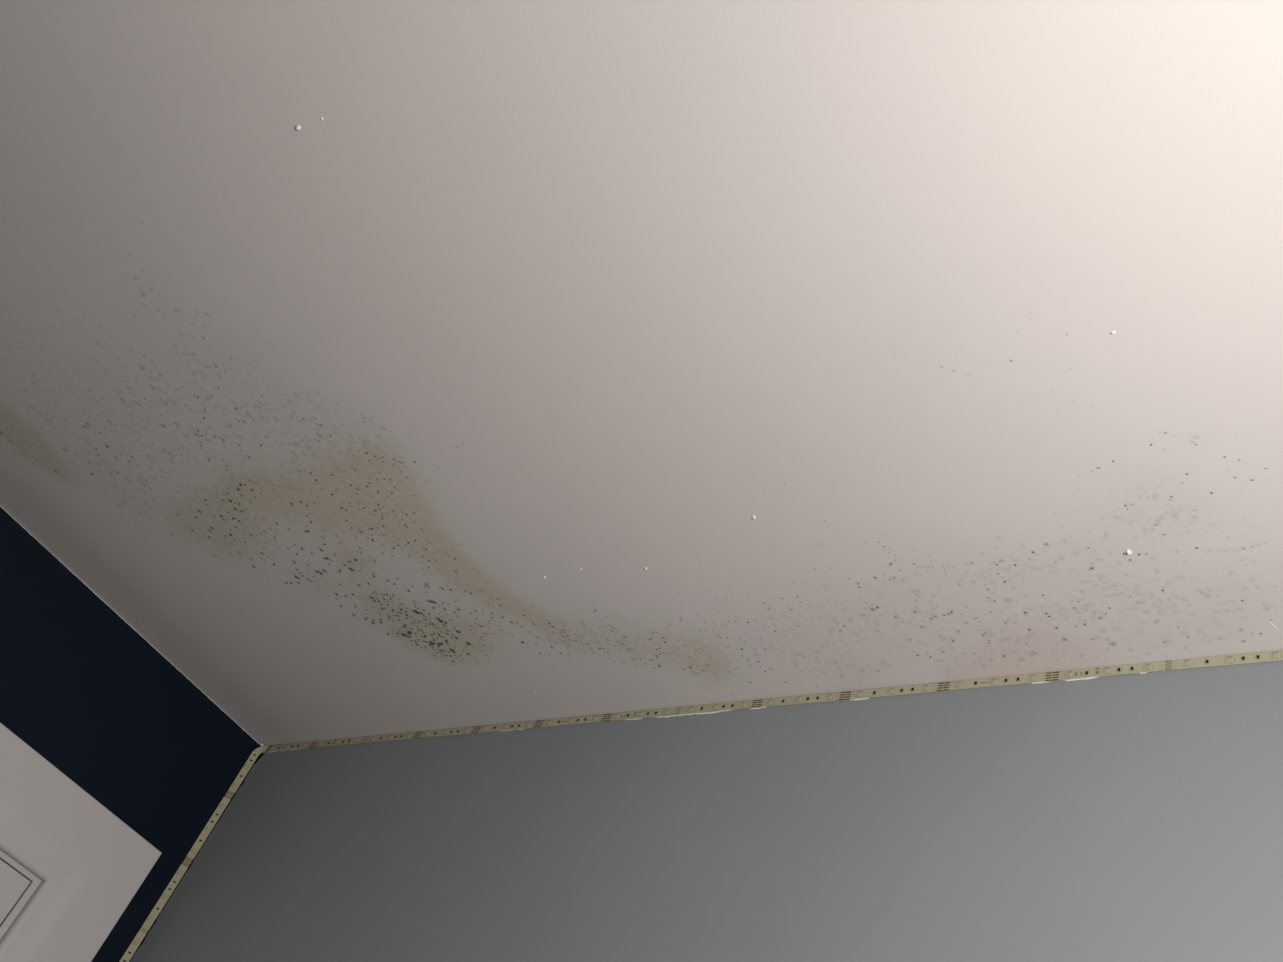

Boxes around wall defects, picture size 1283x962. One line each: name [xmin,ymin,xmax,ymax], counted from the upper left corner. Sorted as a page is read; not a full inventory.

leakage [285,459,561,666]